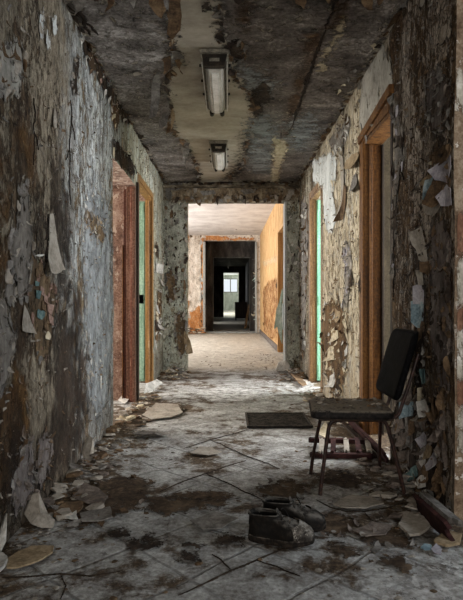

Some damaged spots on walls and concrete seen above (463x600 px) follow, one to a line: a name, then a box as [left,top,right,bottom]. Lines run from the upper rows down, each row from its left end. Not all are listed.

peeling [0,16,33,103]
peeling [31,6,58,50]
peeling [64,0,463,511]
flaking render [0,161,115,520]
crack [160,429,279,500]
crack [2,571,120,599]
crack [178,548,300,596]